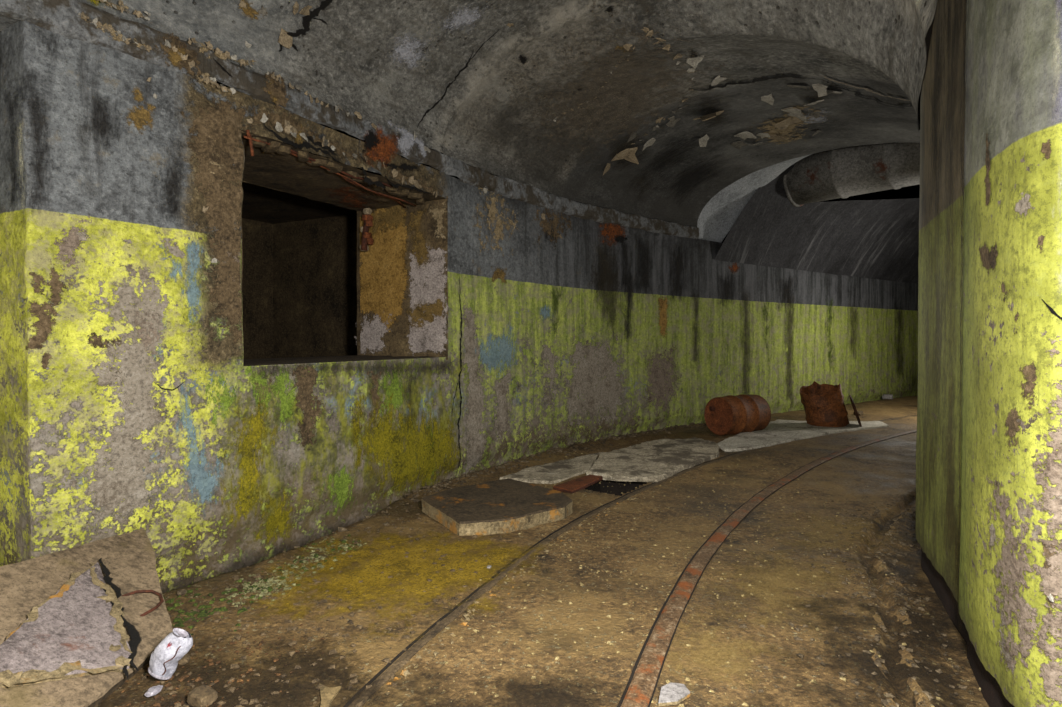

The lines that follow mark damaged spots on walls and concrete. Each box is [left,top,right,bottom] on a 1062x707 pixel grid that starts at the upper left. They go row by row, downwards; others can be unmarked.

crack [278,0,333,52]
corrosion [363,123,422,173]
peeling [603,132,656,175]
peeling [731,83,843,150]
peeling [26,216,92,369]
peeling [64,0,520,526]
water stain [596,240,699,361]
water stain [718,274,750,394]
water stain [763,278,793,399]
water stain [291,363,450,473]
water stain [254,491,295,544]
peeling [985,336,1062,707]